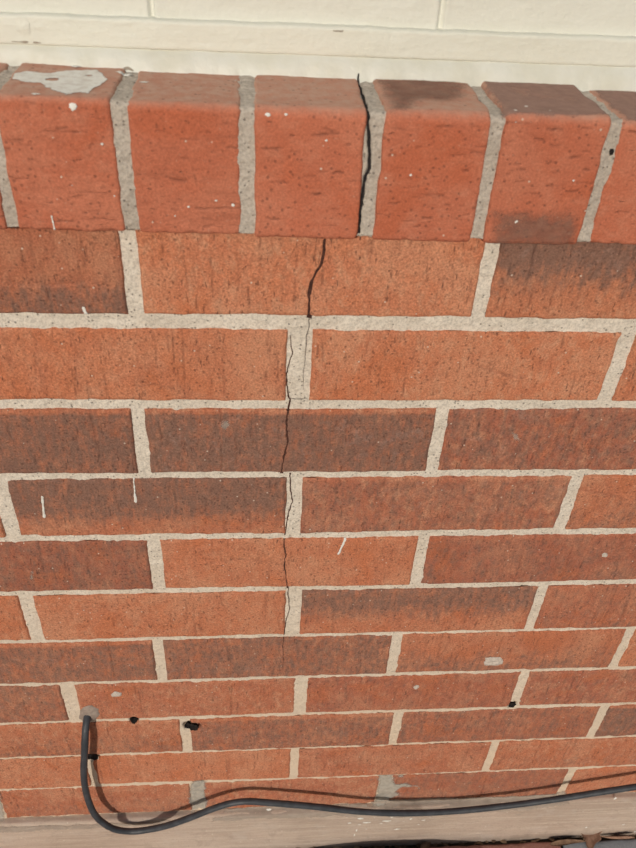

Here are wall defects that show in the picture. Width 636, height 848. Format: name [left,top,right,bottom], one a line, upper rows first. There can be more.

crack [357,74,371,234]
crack [280,239,326,661]